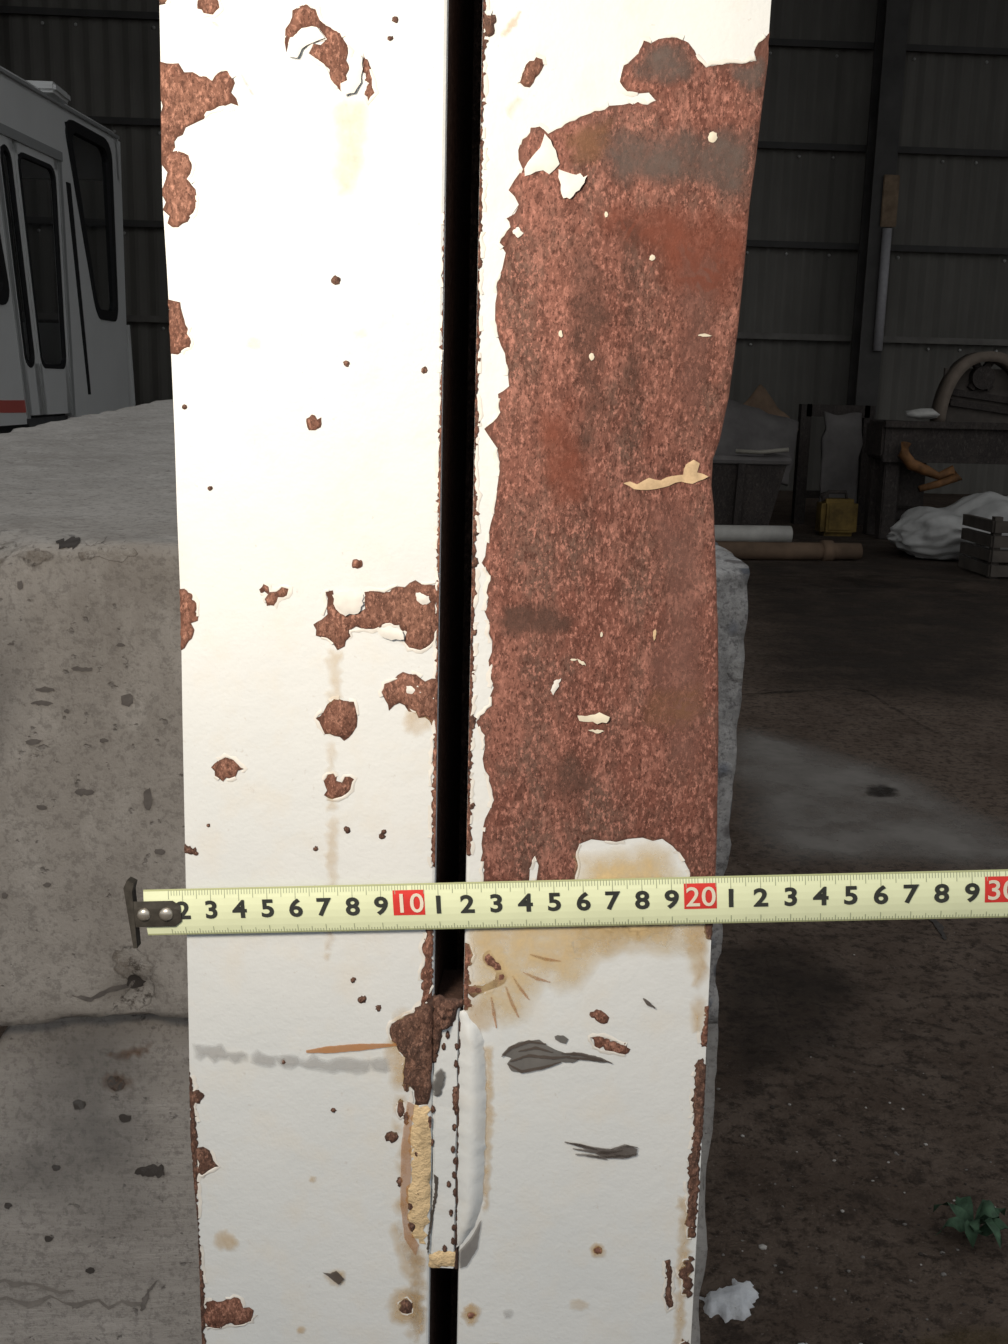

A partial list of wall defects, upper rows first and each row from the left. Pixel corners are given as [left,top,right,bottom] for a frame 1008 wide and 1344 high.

peeling [283,0,363,95]
corrosion [517,52,547,87]
corrosion [314,695,359,741]
corrosion [592,856,662,879]
corrosion [306,929,481,1269]
corrosion [683,1006,709,1240]
corrosion [189,1072,258,1344]
crack [0,1279,158,1311]
corrosion [660,1256,695,1314]